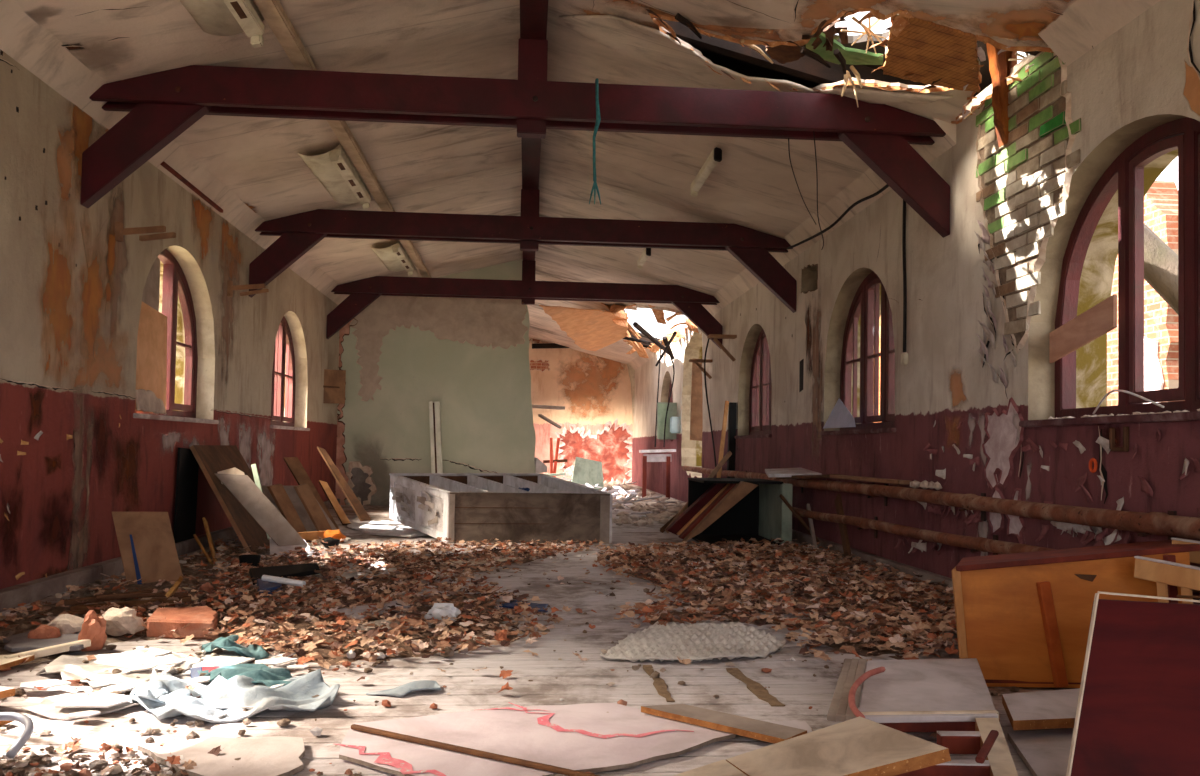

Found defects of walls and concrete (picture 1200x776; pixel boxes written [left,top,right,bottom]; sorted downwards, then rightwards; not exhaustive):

spalling [695,7,912,56]
crack [1187,0,1200,80]
spalling [820,81,953,93]
peeling [1183,59,1200,117]
flaking render [917,34,1134,546]
peeling [335,296,550,525]
peeling [555,418,633,484]
peeling [894,536,942,556]